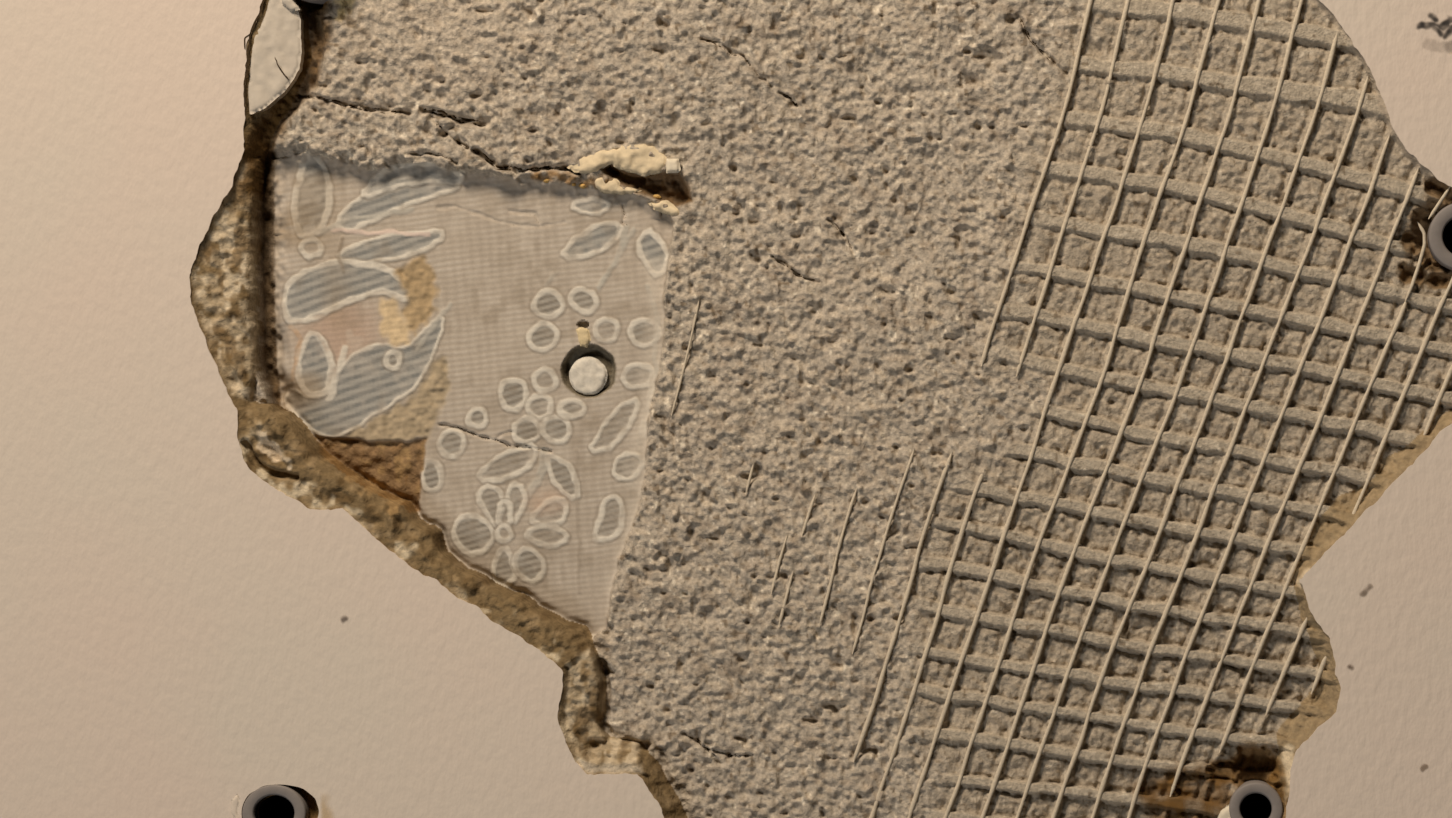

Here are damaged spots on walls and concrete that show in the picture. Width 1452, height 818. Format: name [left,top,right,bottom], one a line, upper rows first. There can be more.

crack [300,95,573,172]
spalling [190,0,1171,818]
spalling [907,0,1452,818]